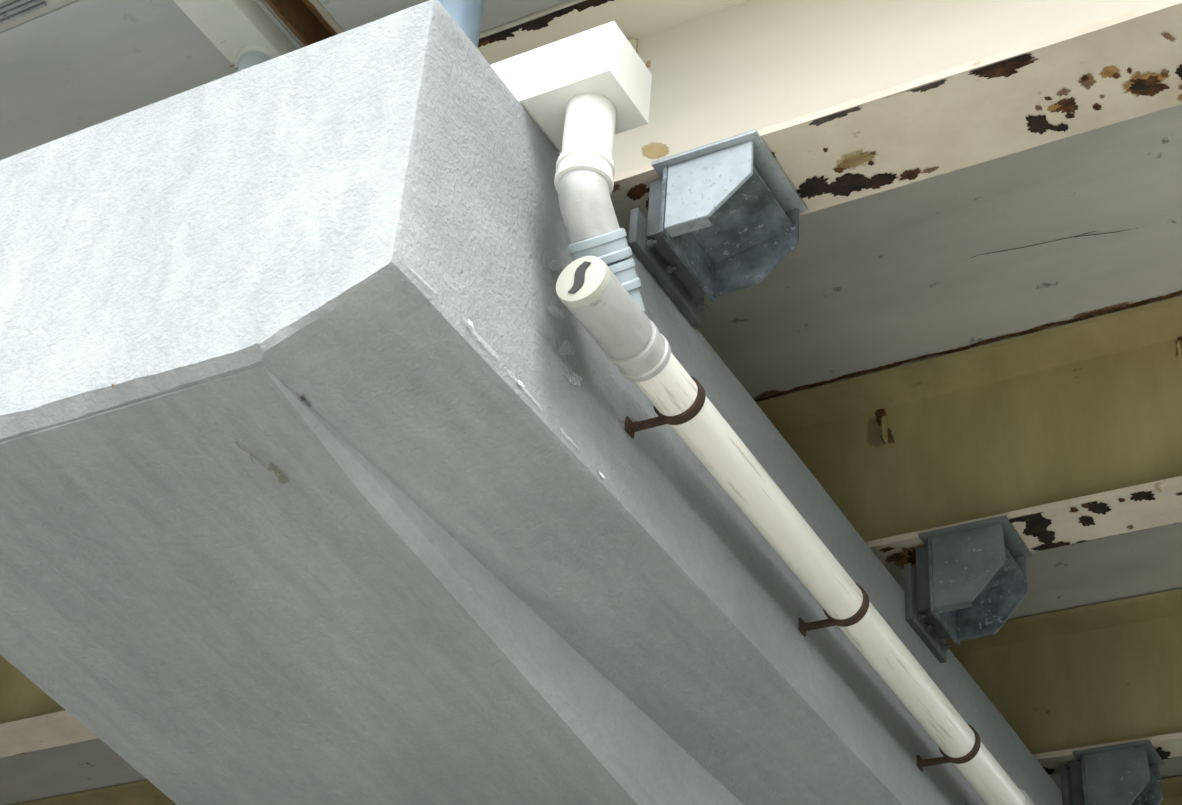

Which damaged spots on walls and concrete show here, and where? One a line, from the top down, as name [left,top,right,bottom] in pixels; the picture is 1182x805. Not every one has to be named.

peeling [968,53,1038,79]
peeling [880,77,951,100]
peeling [809,106,861,126]
peeling [1025,115,1068,134]
peeling [796,167,938,199]
crack [963,229,1131,261]
peeling [1069,491,1156,526]
peeling [1009,512,1156,551]